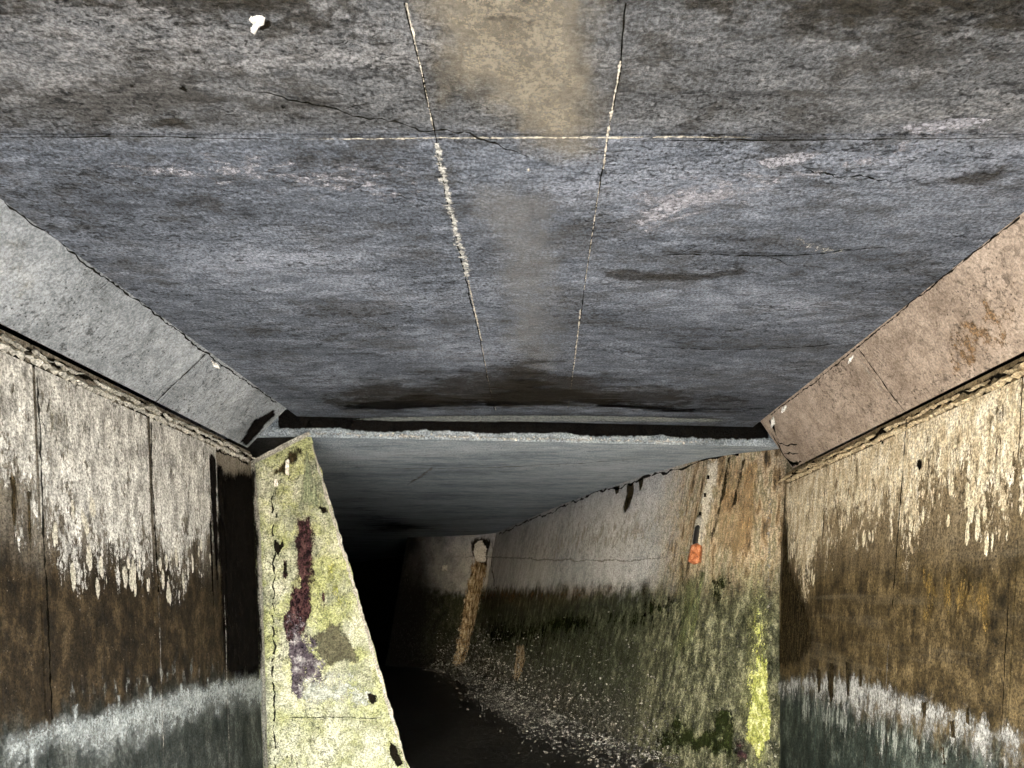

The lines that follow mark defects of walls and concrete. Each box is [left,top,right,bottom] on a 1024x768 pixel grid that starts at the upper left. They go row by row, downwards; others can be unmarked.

crack [244,3,528,375]
damp [345,0,727,150]
crack [568,3,627,407]
damp [8,454,262,768]
crack [0,201,386,768]
damp [240,354,776,446]
damp [710,456,745,540]
damp [746,490,1019,767]